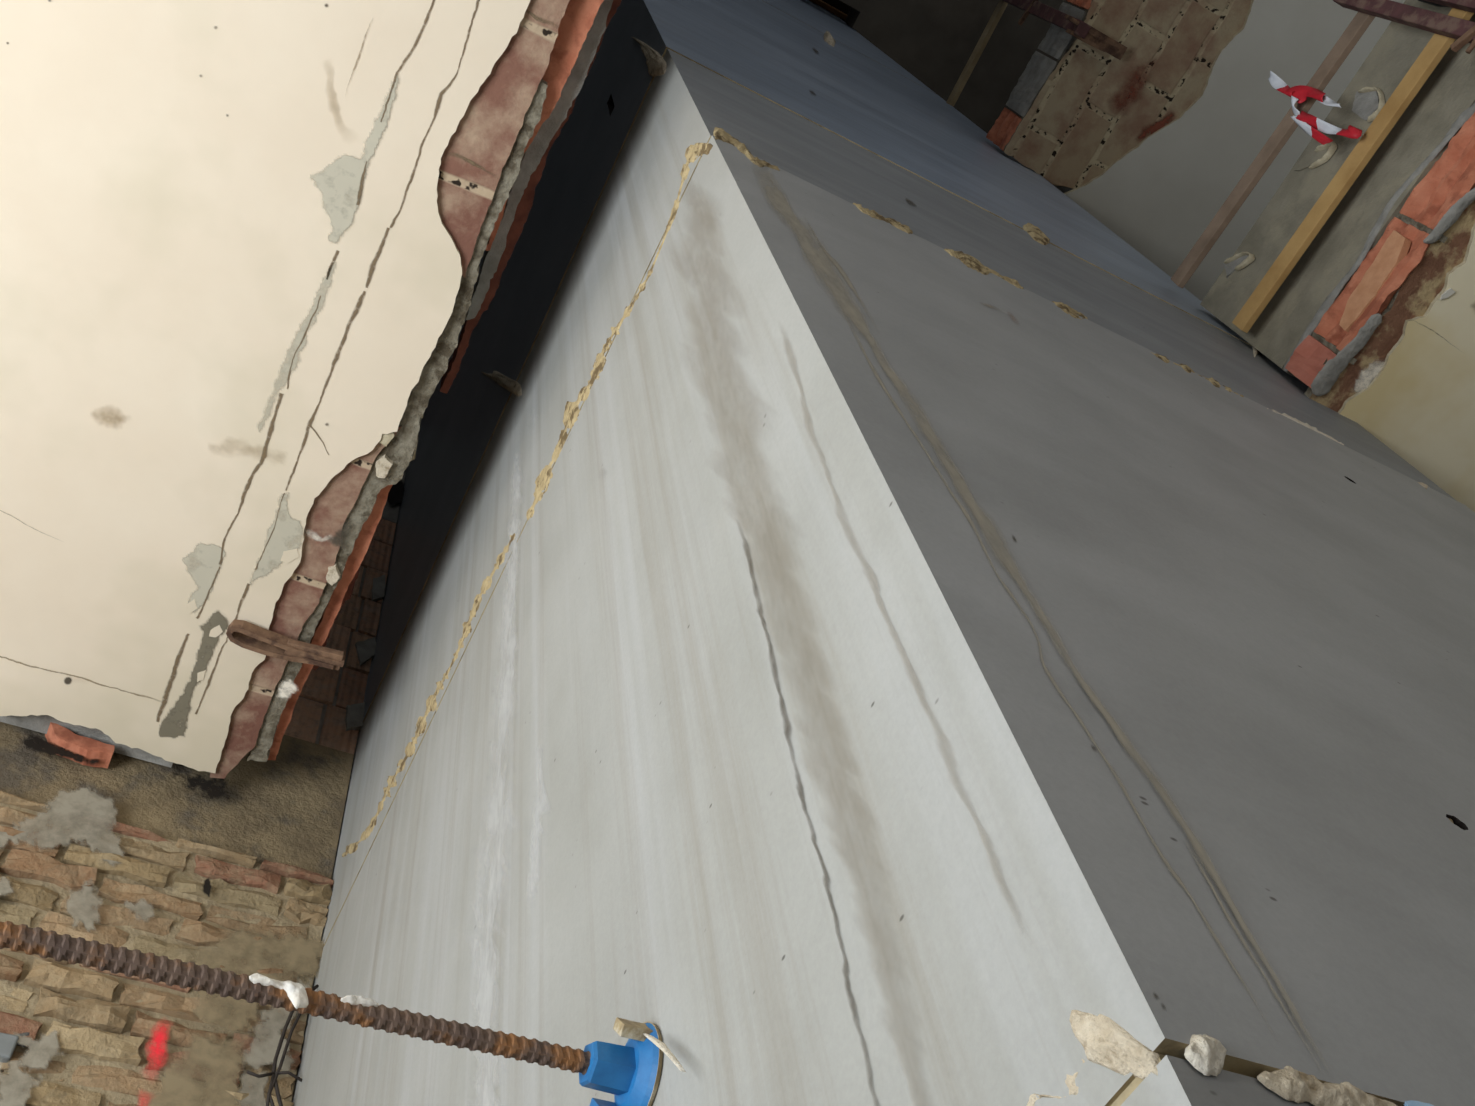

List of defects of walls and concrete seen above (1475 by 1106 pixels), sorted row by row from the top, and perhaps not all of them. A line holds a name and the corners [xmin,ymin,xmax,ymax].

flaking render [1352,87,1385,122]
crack [0,0,480,722]
spalling [250,0,621,647]
spalling [1283,103,1475,412]
spalling [23,735,99,765]
spalling [173,655,319,800]
spalling [203,878,211,897]